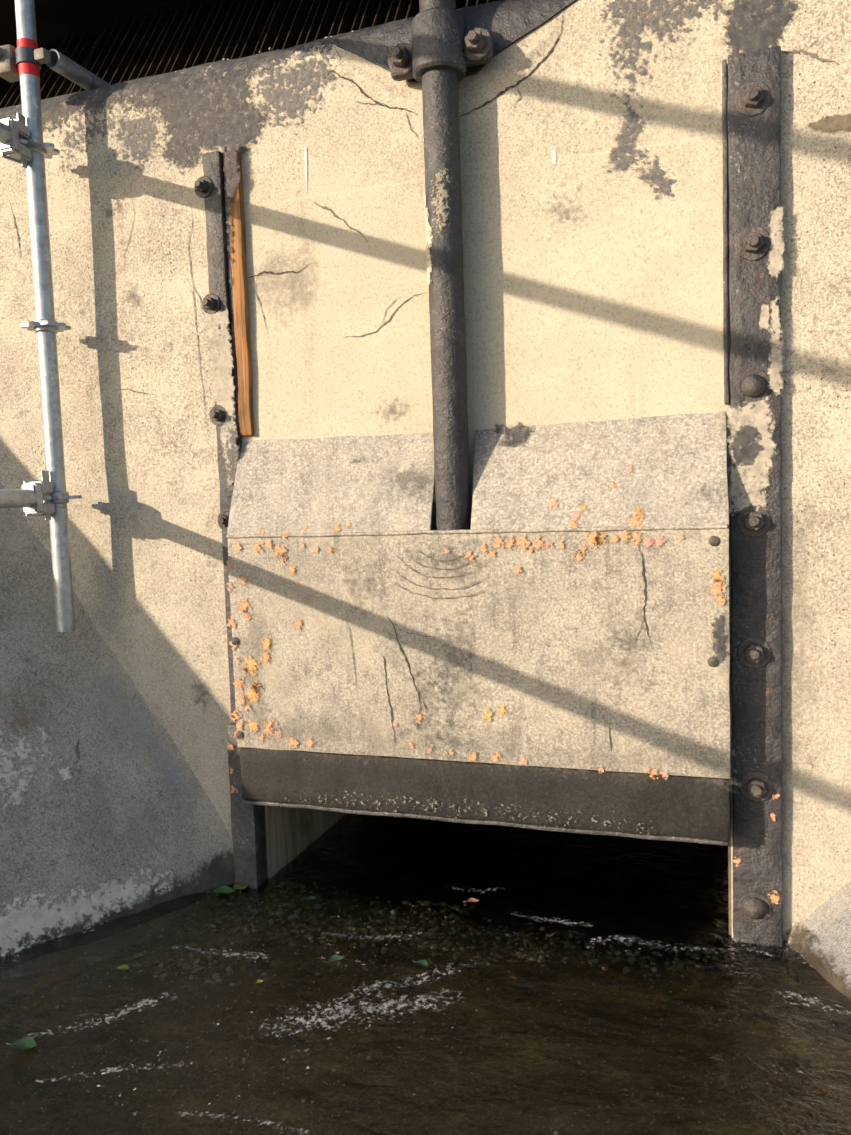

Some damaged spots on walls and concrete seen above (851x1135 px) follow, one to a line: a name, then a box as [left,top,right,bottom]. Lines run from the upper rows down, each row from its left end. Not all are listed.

crack [459,15,563,117]
leakage [808,114,851,133]
leakage [634,150,676,199]
crack [314,202,368,242]
crack [346,293,422,337]
peeling [730,425,763,467]
crack [383,616,437,744]
leakage [0,852,235,973]
leakage [783,923,851,1041]